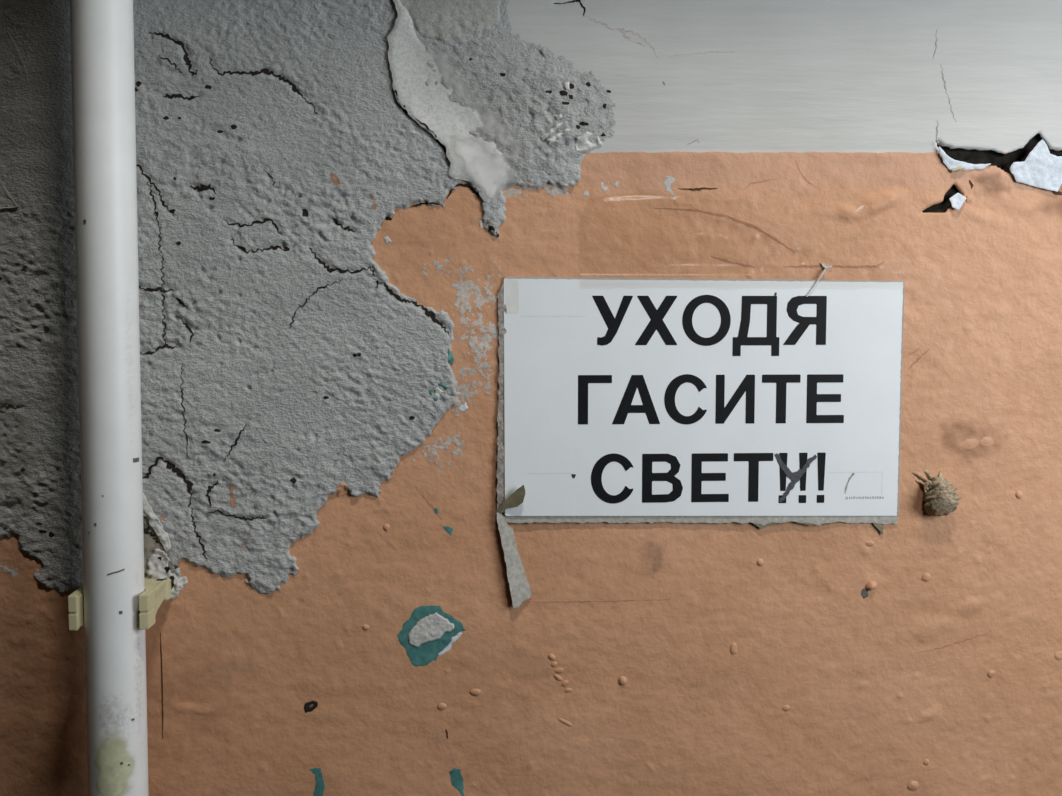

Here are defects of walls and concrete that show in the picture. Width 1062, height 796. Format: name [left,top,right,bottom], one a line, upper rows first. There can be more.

crack [148,32,318,114]
peeling [658,176,718,196]
peeling [922,133,1062,213]
flaking render [0,0,83,594]
crack [226,218,449,334]
flaking render [133,0,618,599]
crack [136,164,265,559]
peeling [397,605,465,667]